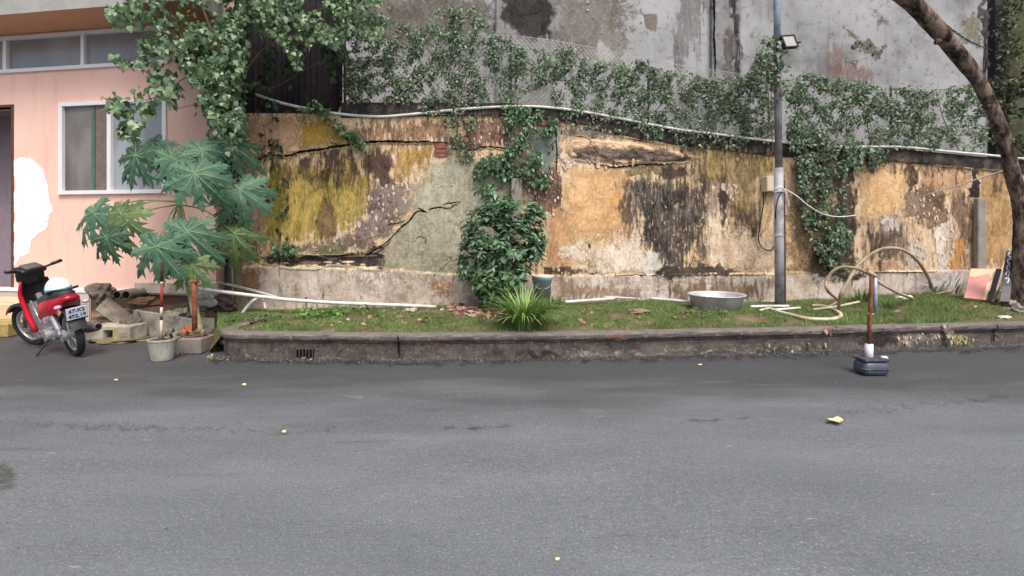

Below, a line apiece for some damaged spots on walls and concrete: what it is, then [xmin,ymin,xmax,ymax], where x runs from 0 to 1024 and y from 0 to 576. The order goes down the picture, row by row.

water stain [353,0,642,75]
peeling [844,26,887,67]
crack [258,140,505,166]
peeling [14,157,53,266]
water stain [242,111,448,273]
crack [297,201,462,276]
water stain [542,144,1013,301]